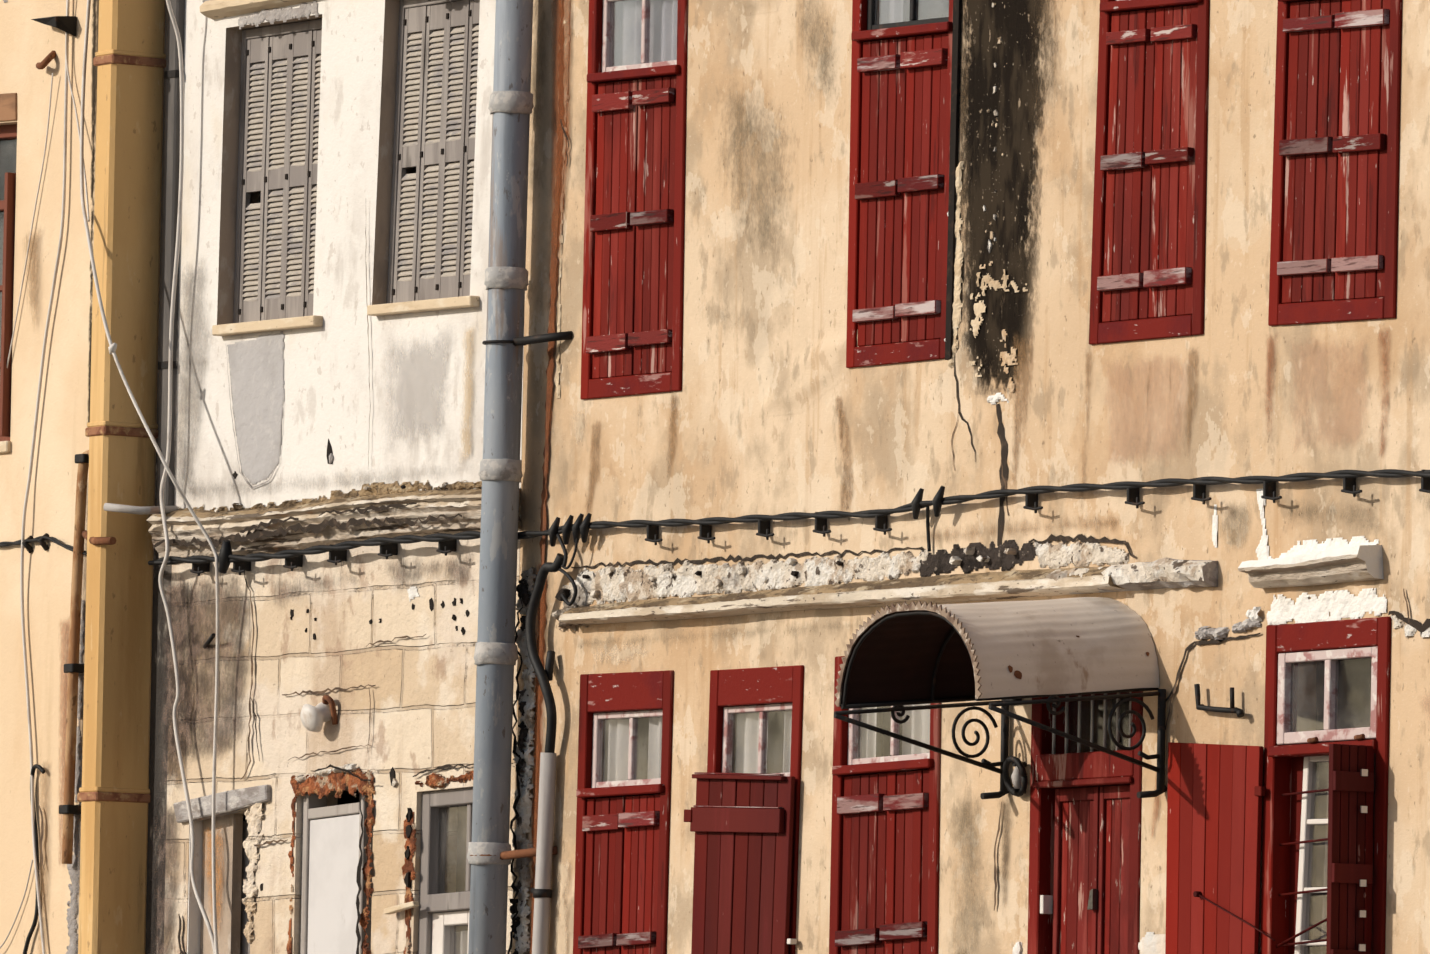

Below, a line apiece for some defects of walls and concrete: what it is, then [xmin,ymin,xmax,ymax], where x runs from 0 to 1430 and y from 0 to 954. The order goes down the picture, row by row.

water stain [945,0,1053,470]
crack [951,361,1009,546]
water stain [164,578,246,781]
spalling [552,534,1135,631]
spalling [1194,607,1262,642]
spalling [242,803,264,943]
peeling [1138,932,1166,954]